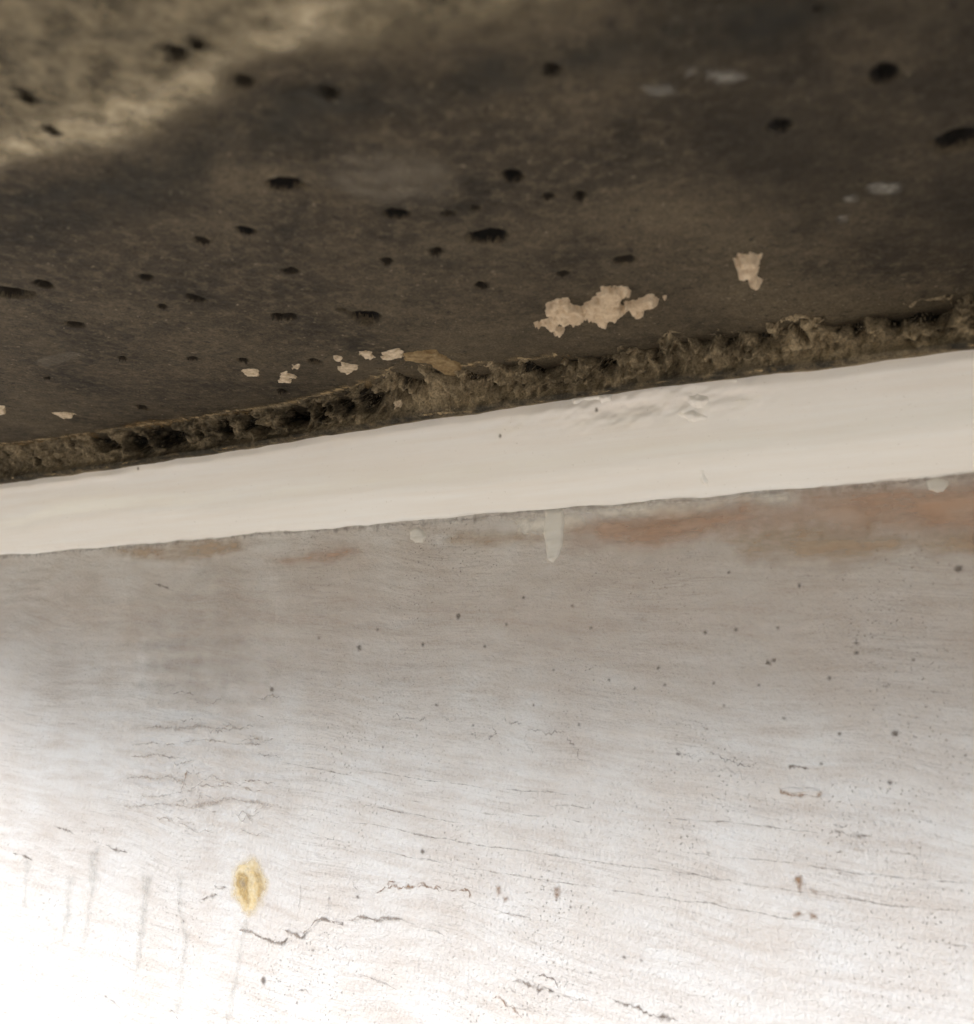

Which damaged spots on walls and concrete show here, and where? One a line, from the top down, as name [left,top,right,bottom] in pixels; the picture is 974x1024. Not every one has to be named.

spalling [0,286,974,484]
corrosion [234,861,265,911]